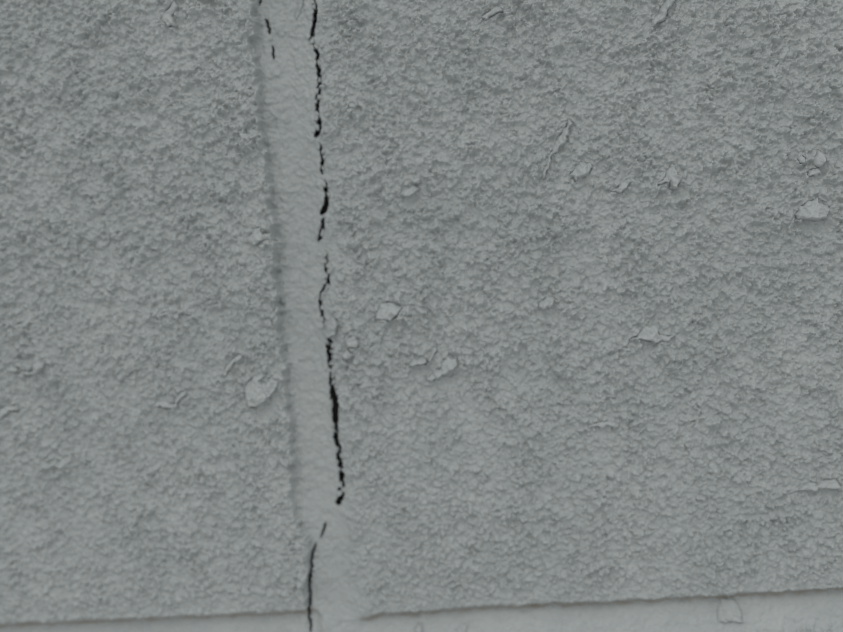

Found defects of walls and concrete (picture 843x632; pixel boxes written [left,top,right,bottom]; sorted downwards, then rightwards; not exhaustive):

crack [309,0,345,505]
crack [308,523,326,629]